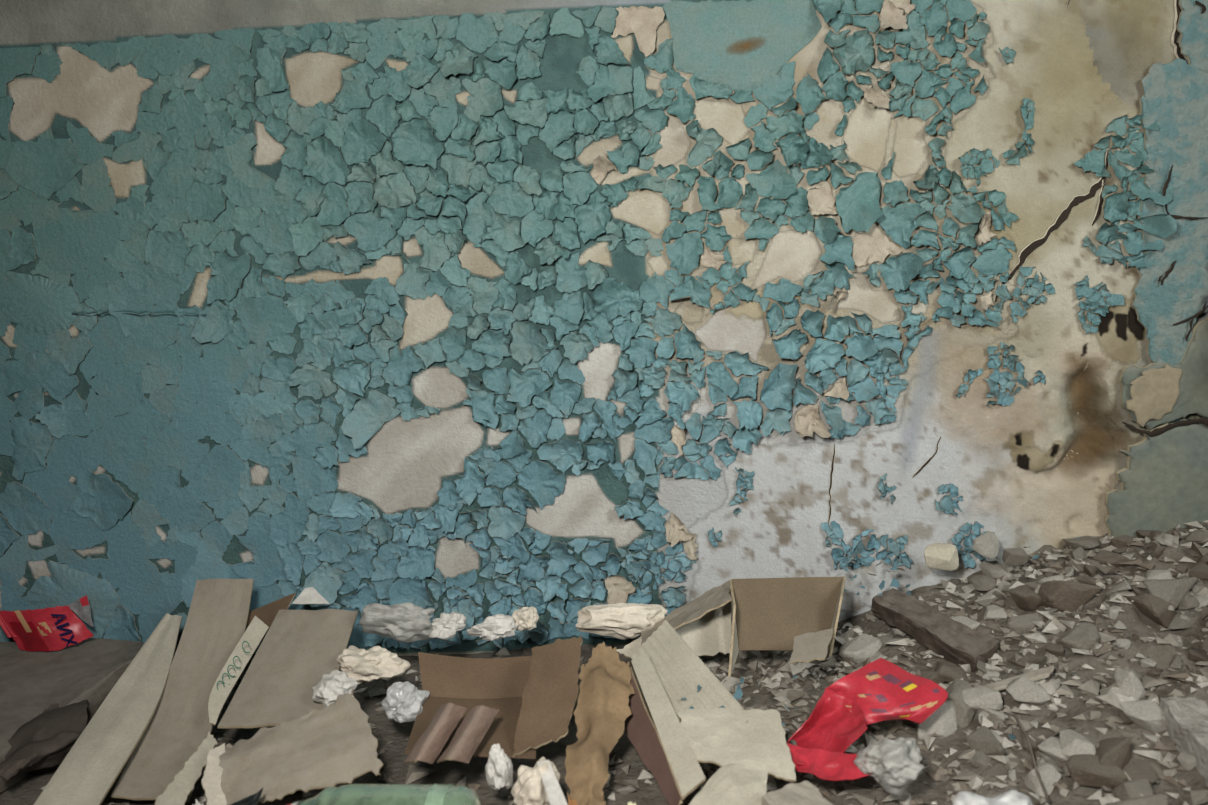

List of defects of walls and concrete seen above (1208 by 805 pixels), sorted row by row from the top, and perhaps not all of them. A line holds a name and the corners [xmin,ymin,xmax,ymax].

crack [1171,0,1206,65]
crack [993,150,1109,302]
peeling [0,0,989,650]
flaking render [637,0,1208,612]
crack [1122,416,1208,437]
peeling [173,608,190,658]